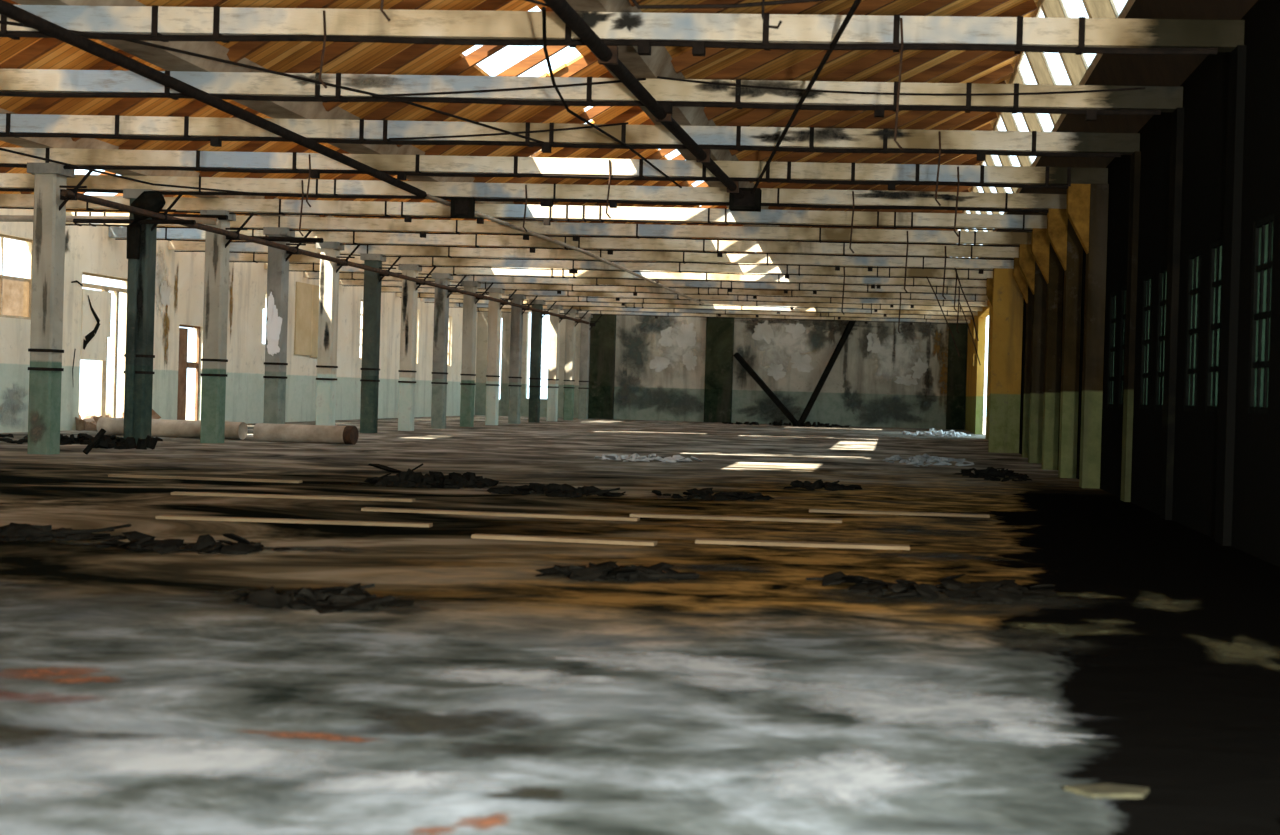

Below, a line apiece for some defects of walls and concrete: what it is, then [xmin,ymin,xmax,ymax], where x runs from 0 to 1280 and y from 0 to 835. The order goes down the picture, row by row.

spalling [265,292,282,356]
water stain [615,315,703,414]
water stain [737,319,936,425]